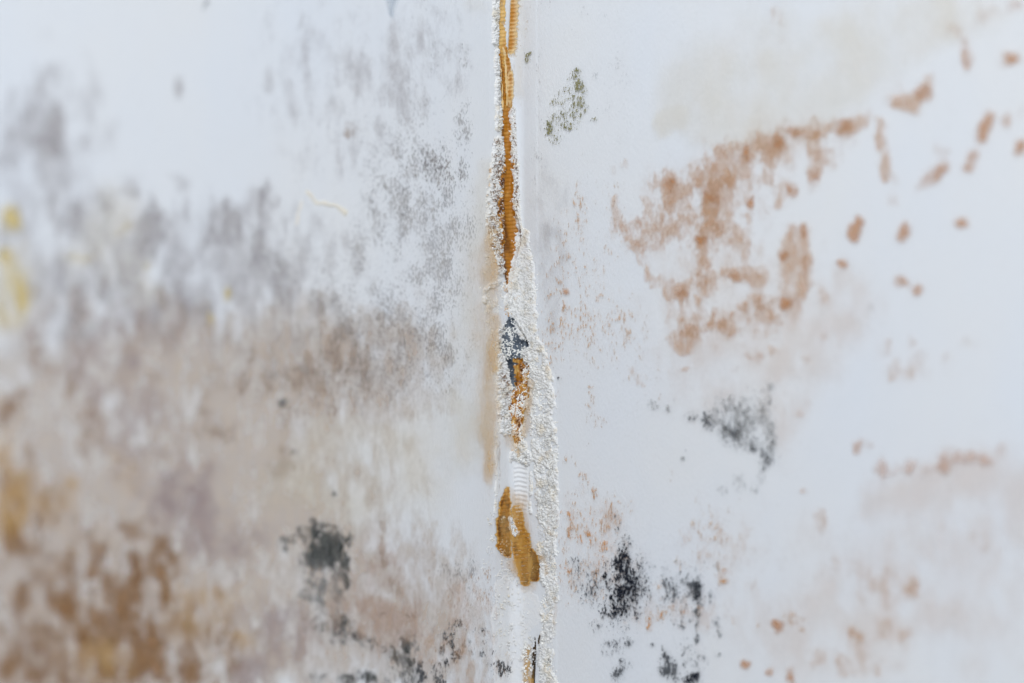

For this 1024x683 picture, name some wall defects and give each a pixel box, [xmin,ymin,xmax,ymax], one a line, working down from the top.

crack [498,0,519,292]
mould [544,67,598,145]
mould [688,384,777,471]
water stain [48,539,174,680]
mould [281,518,462,683]
crack [520,635,551,683]
mould [567,515,714,683]